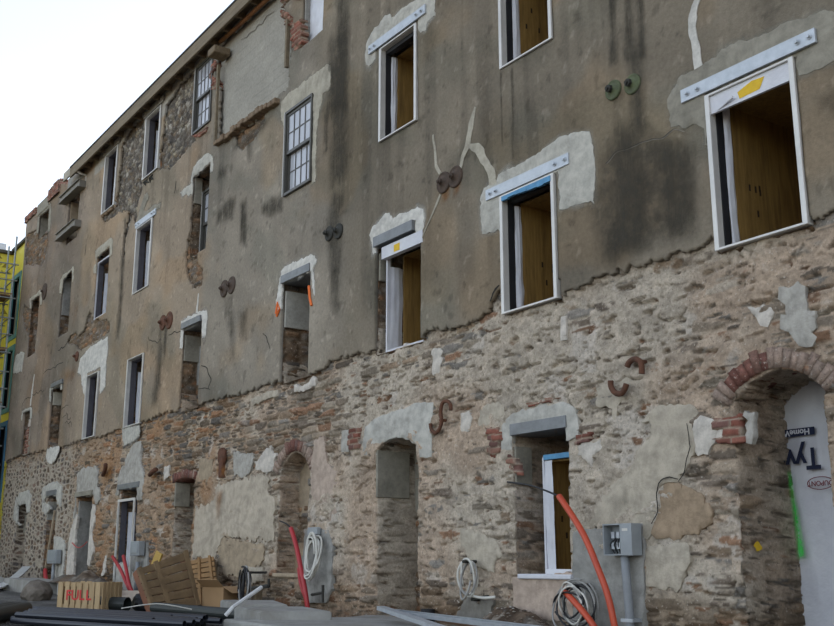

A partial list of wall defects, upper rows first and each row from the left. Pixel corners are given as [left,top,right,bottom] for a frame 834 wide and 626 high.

crack [688,0,703,70]
spalling [160,72,196,170]
crack [422,107,497,238]
spalling [26,231,48,266]
spalling [187,193,203,288]
spalling [68,314,110,350]